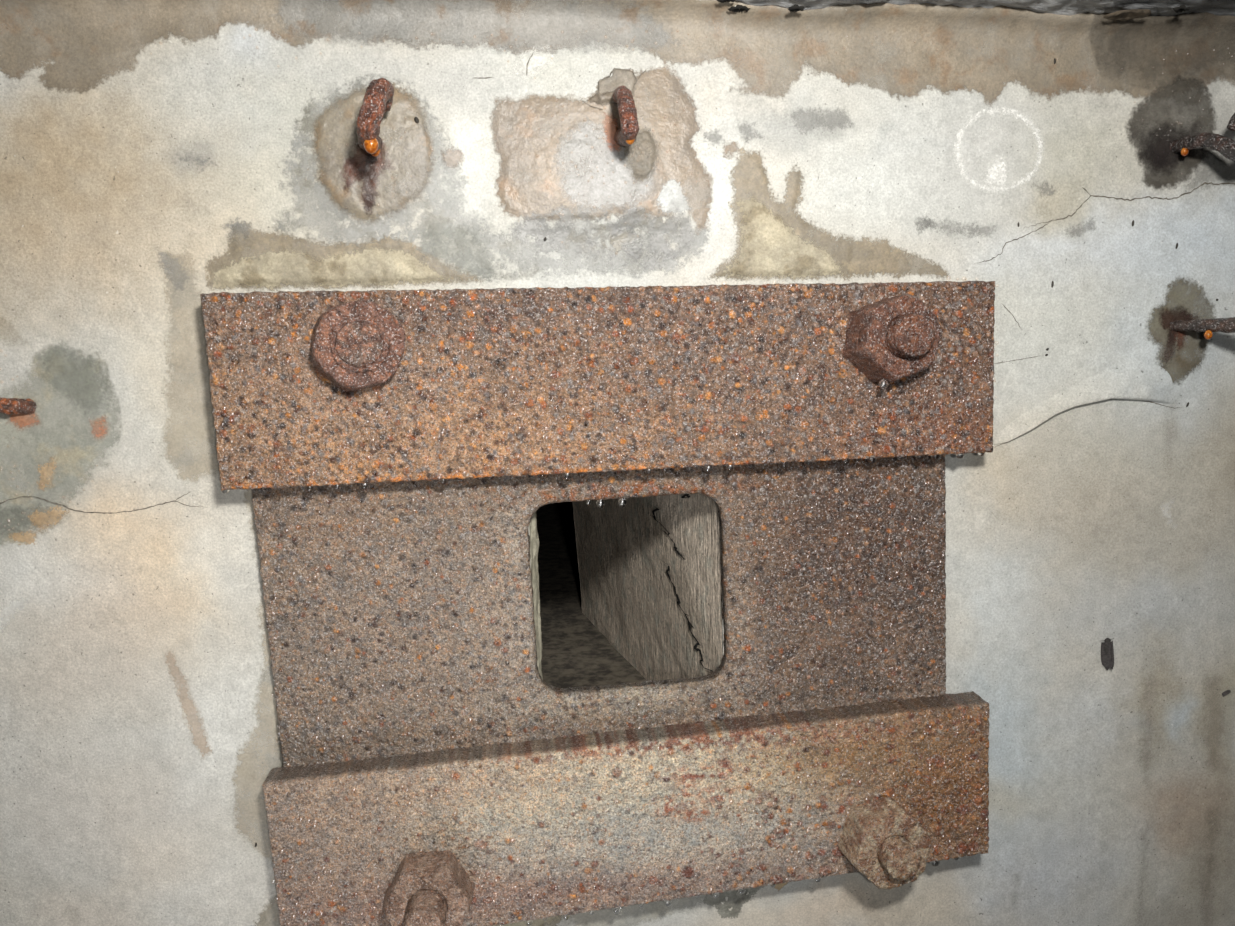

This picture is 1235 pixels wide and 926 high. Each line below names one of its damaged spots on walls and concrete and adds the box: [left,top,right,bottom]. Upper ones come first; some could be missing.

rust [605,118,629,155]
leakage [0,0,1235,279]
rust [345,143,390,211]
crack [980,182,1235,263]
leakage [1148,279,1214,384]
crack [0,493,206,514]
spalling [255,896,280,926]
spalling [703,882,788,918]